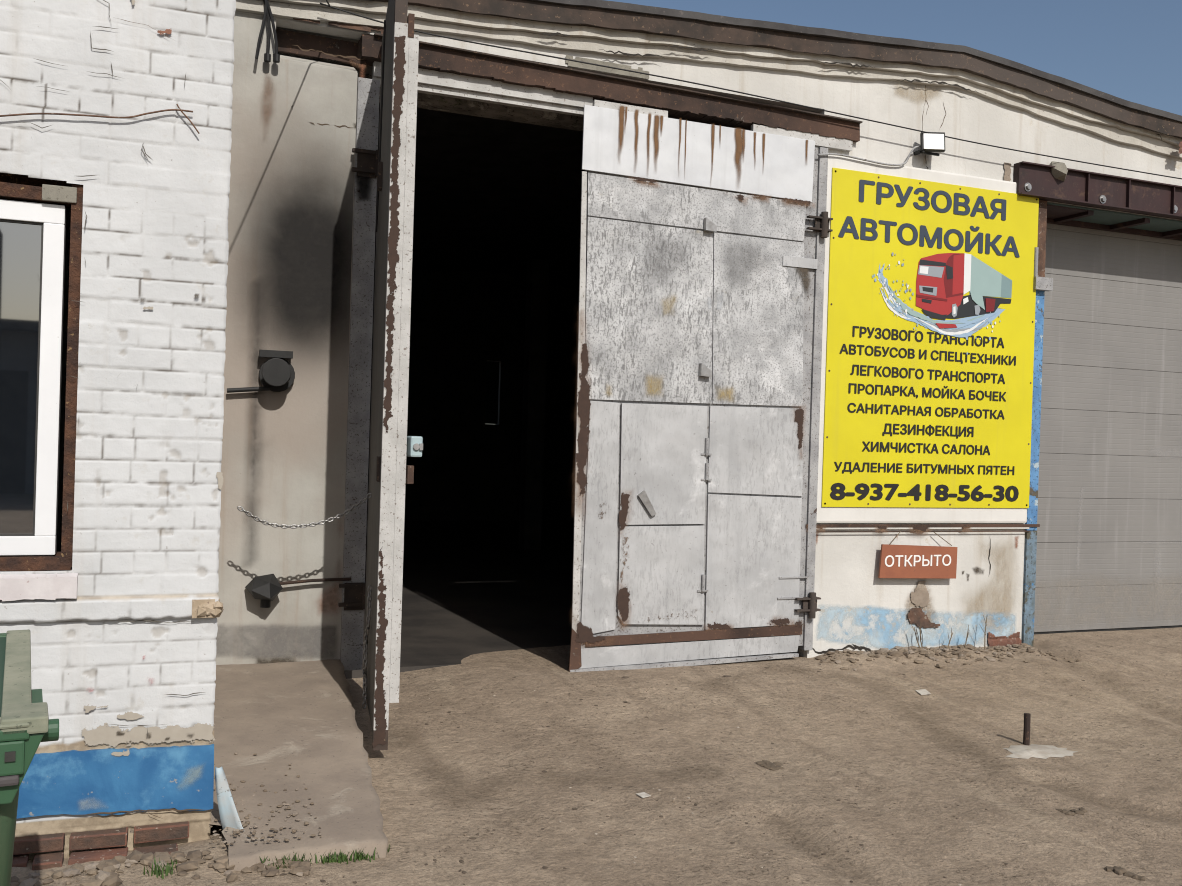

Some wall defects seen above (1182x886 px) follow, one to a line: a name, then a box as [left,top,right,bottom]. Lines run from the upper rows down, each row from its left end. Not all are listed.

corrosion [619,106,663,160]
corrosion [711,124,721,167]
corrosion [735,128,765,176]
corrosion [383,36,406,433]
corrosion [576,343,591,496]
corrosion [598,493,697,623]
corrosion [575,611,609,643]
corrosion [707,622,731,630]
corrosion [770,618,803,628]
flaking render [907,581,940,628]
flaking render [987,632,1022,647]
peeling [81,704,215,756]